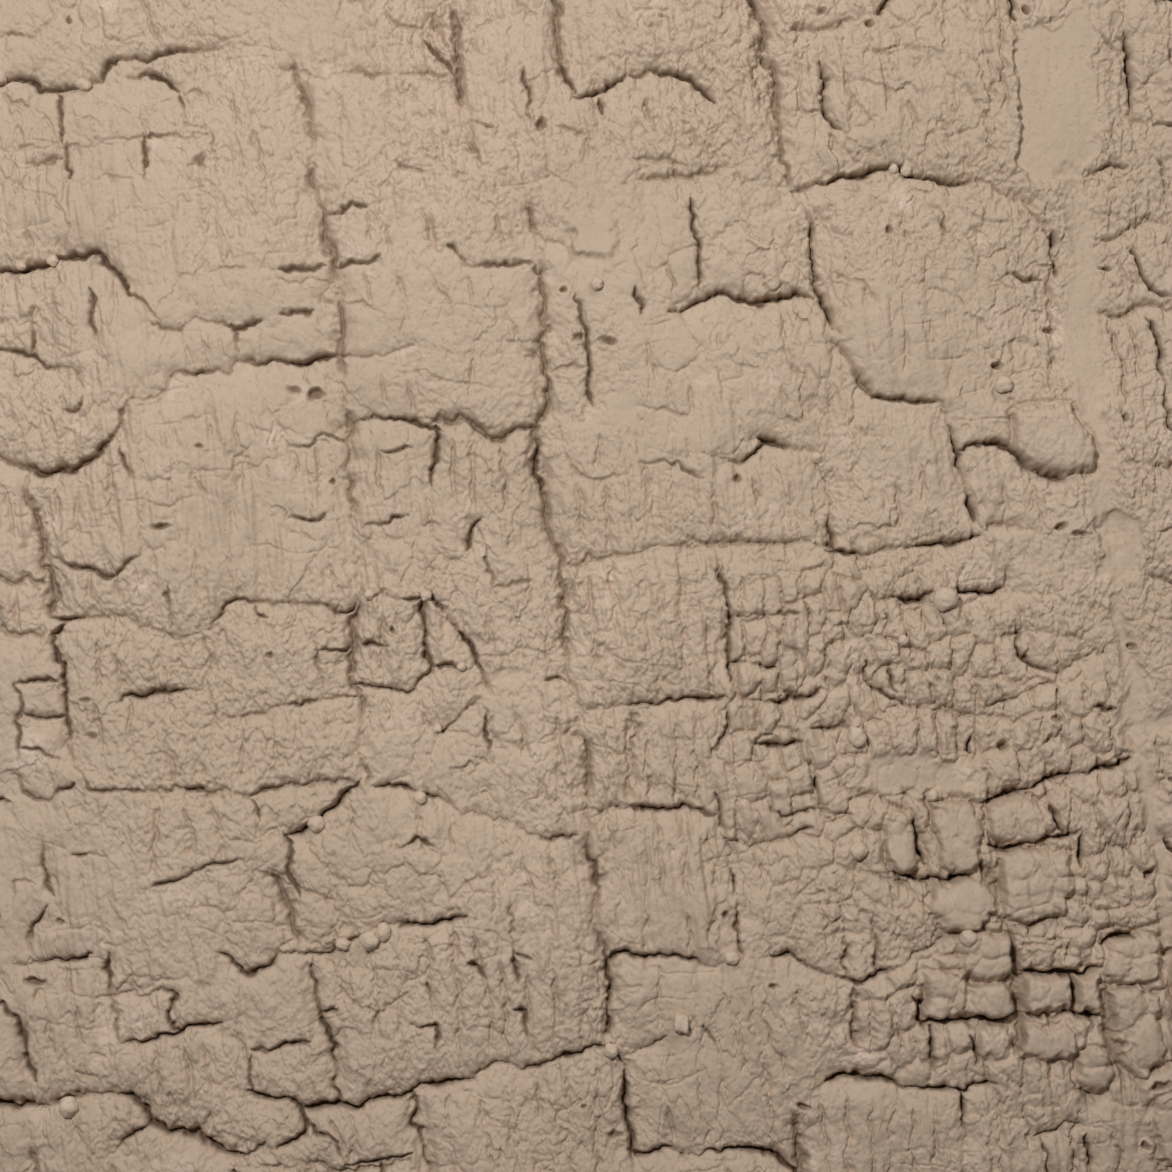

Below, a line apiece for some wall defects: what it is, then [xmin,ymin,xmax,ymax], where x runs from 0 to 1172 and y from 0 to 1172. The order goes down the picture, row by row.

crack [520,0,720,129]
crack [617,0,1068,524]
crack [1084,31,1172,432]
crack [0,0,499,823]
crack [218,193,1061,1172]
crack [860,623,1112,754]
crack [0,997,38,1084]
crack [0,836,225,1046]
crack [152,859,259,890]
crack [0,1089,417,1172]
crack [770,703,1137,1152]
crack [1033,1119,1096,1172]